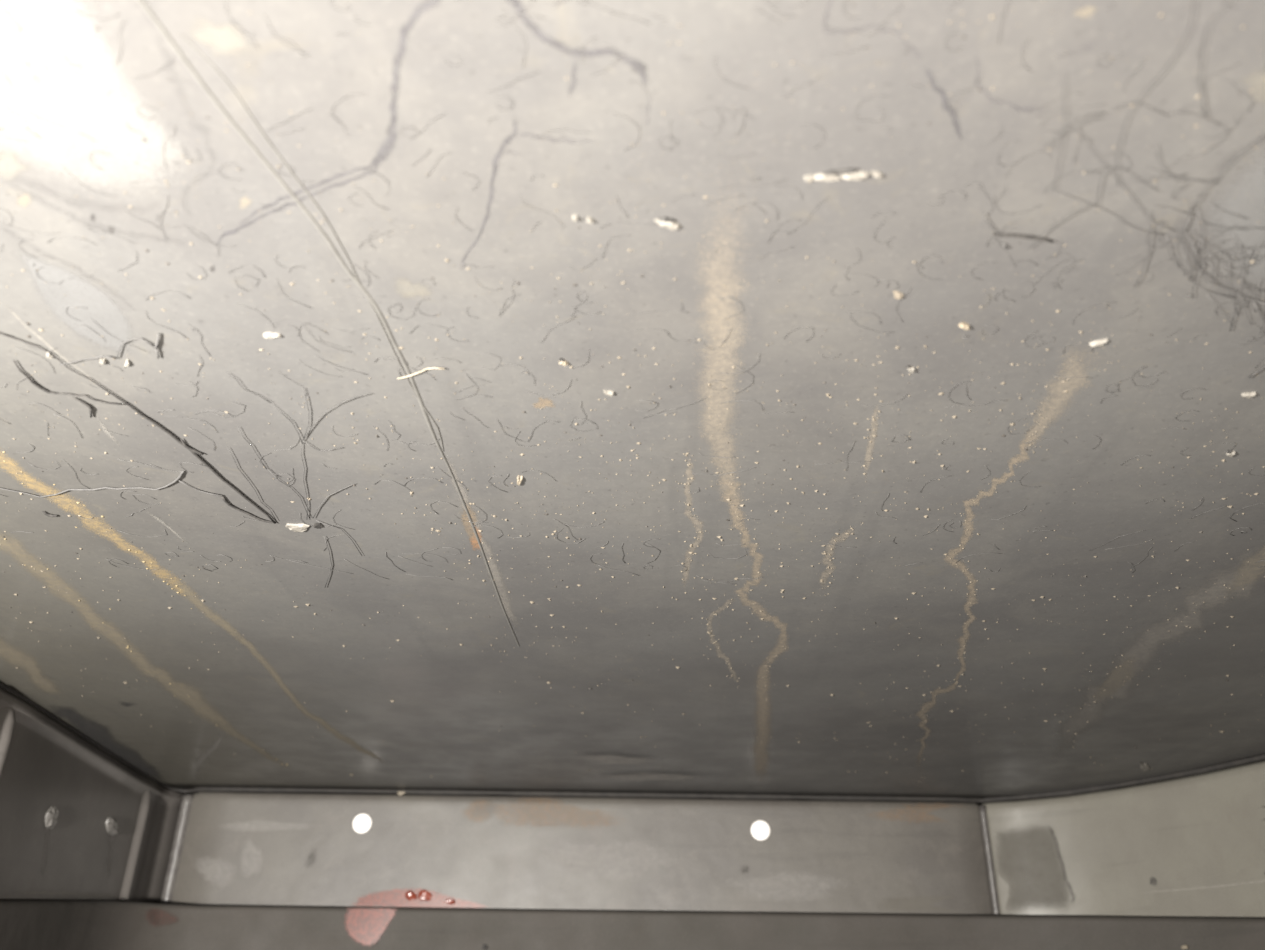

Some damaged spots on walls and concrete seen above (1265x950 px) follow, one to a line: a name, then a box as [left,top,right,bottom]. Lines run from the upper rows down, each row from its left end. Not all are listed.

crack [217,0,440,245]
crack [461,119,593,265]
crack [504,0,651,127]
damp [0,530,288,779]
damp [680,166,789,788]
damp [914,321,1134,782]